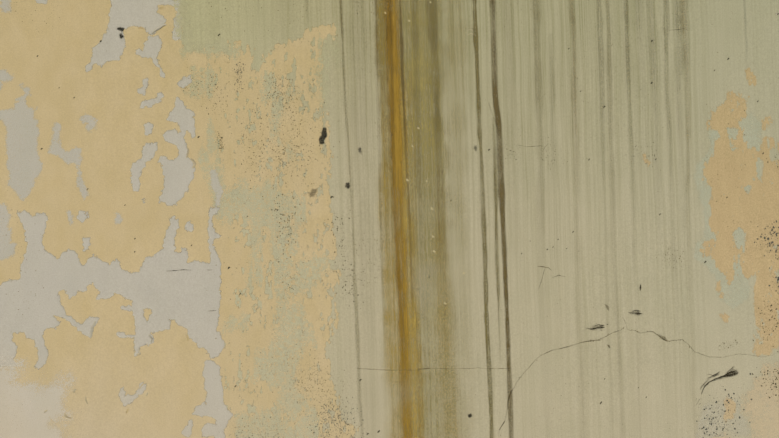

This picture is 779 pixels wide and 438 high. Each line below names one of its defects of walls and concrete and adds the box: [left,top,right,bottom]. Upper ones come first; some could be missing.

peeling [0,0,360,438]
corrosion [376,0,421,438]
damp [401,0,445,279]
damp [473,0,519,438]
peeling [695,90,779,438]